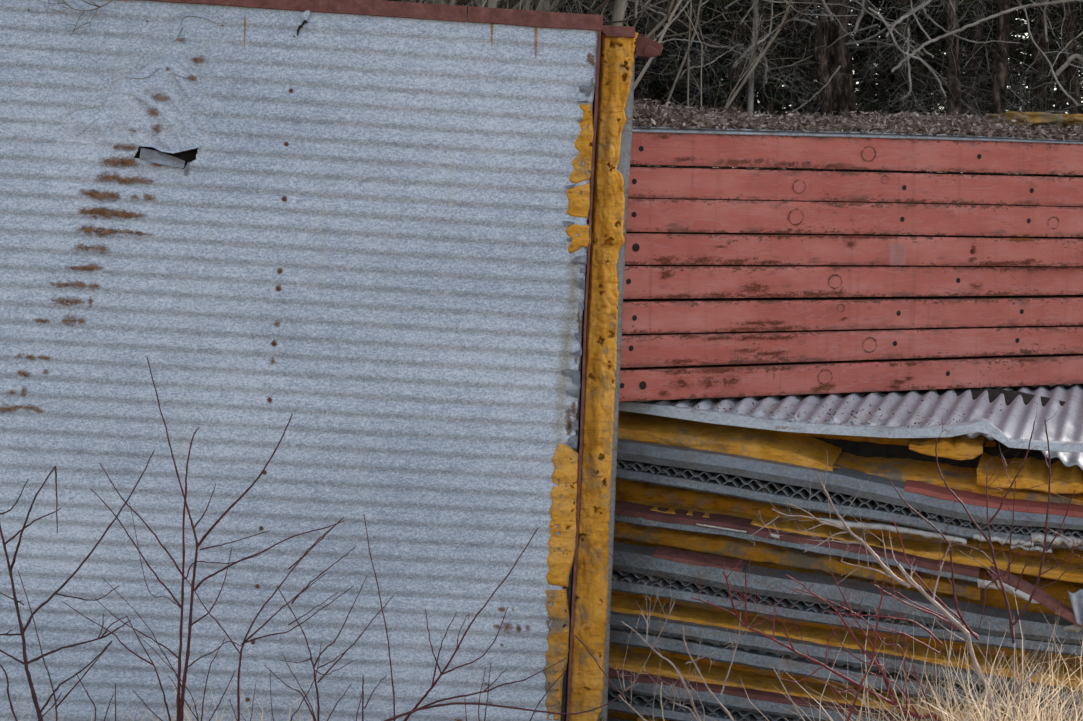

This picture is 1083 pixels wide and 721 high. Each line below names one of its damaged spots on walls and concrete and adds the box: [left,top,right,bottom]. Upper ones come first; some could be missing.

rust [147,94,166,133]
rust [76,145,154,253]
rust [51,264,102,325]
rust [0,354,49,412]